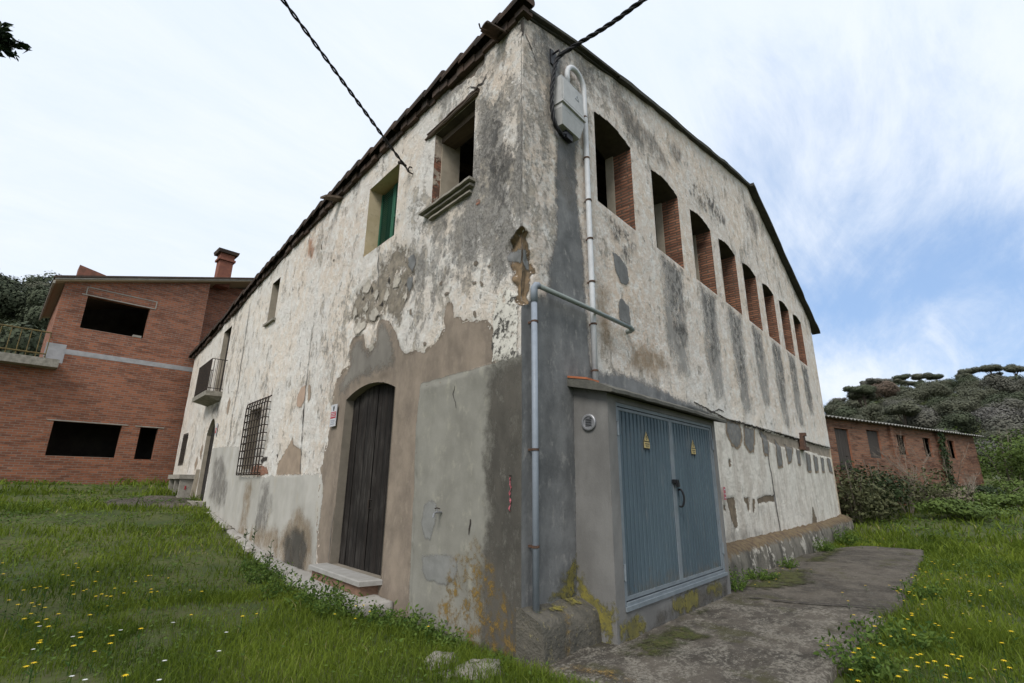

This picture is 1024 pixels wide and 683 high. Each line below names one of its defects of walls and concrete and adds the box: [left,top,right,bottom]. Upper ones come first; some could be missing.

damp [755,334,811,403]
flaking render [250,440,301,477]
flaking render [316,225,535,618]
flaking render [726,419,833,474]
damp [241,486,310,569]
flaking render [723,495,774,528]